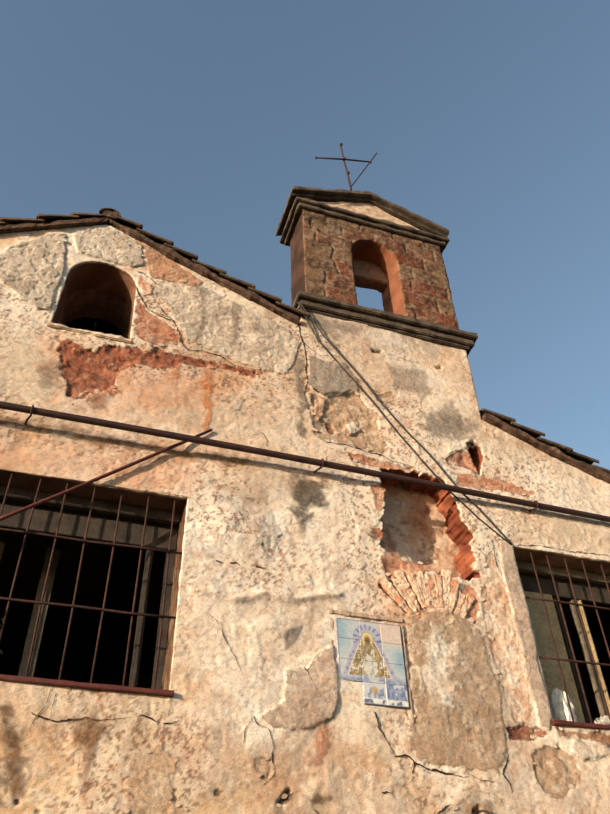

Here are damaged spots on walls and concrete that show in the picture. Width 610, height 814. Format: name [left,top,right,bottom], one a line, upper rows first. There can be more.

peeling [0,227,301,407]
crack [130,271,259,370]
spalling [307,355,414,473]
spalling [370,485,386,510]
spalling [381,553,438,579]
leakage [0,704,25,797]
crack [28,689,179,733]
peeling [262,645,339,765]
peeling [407,541,610,799]